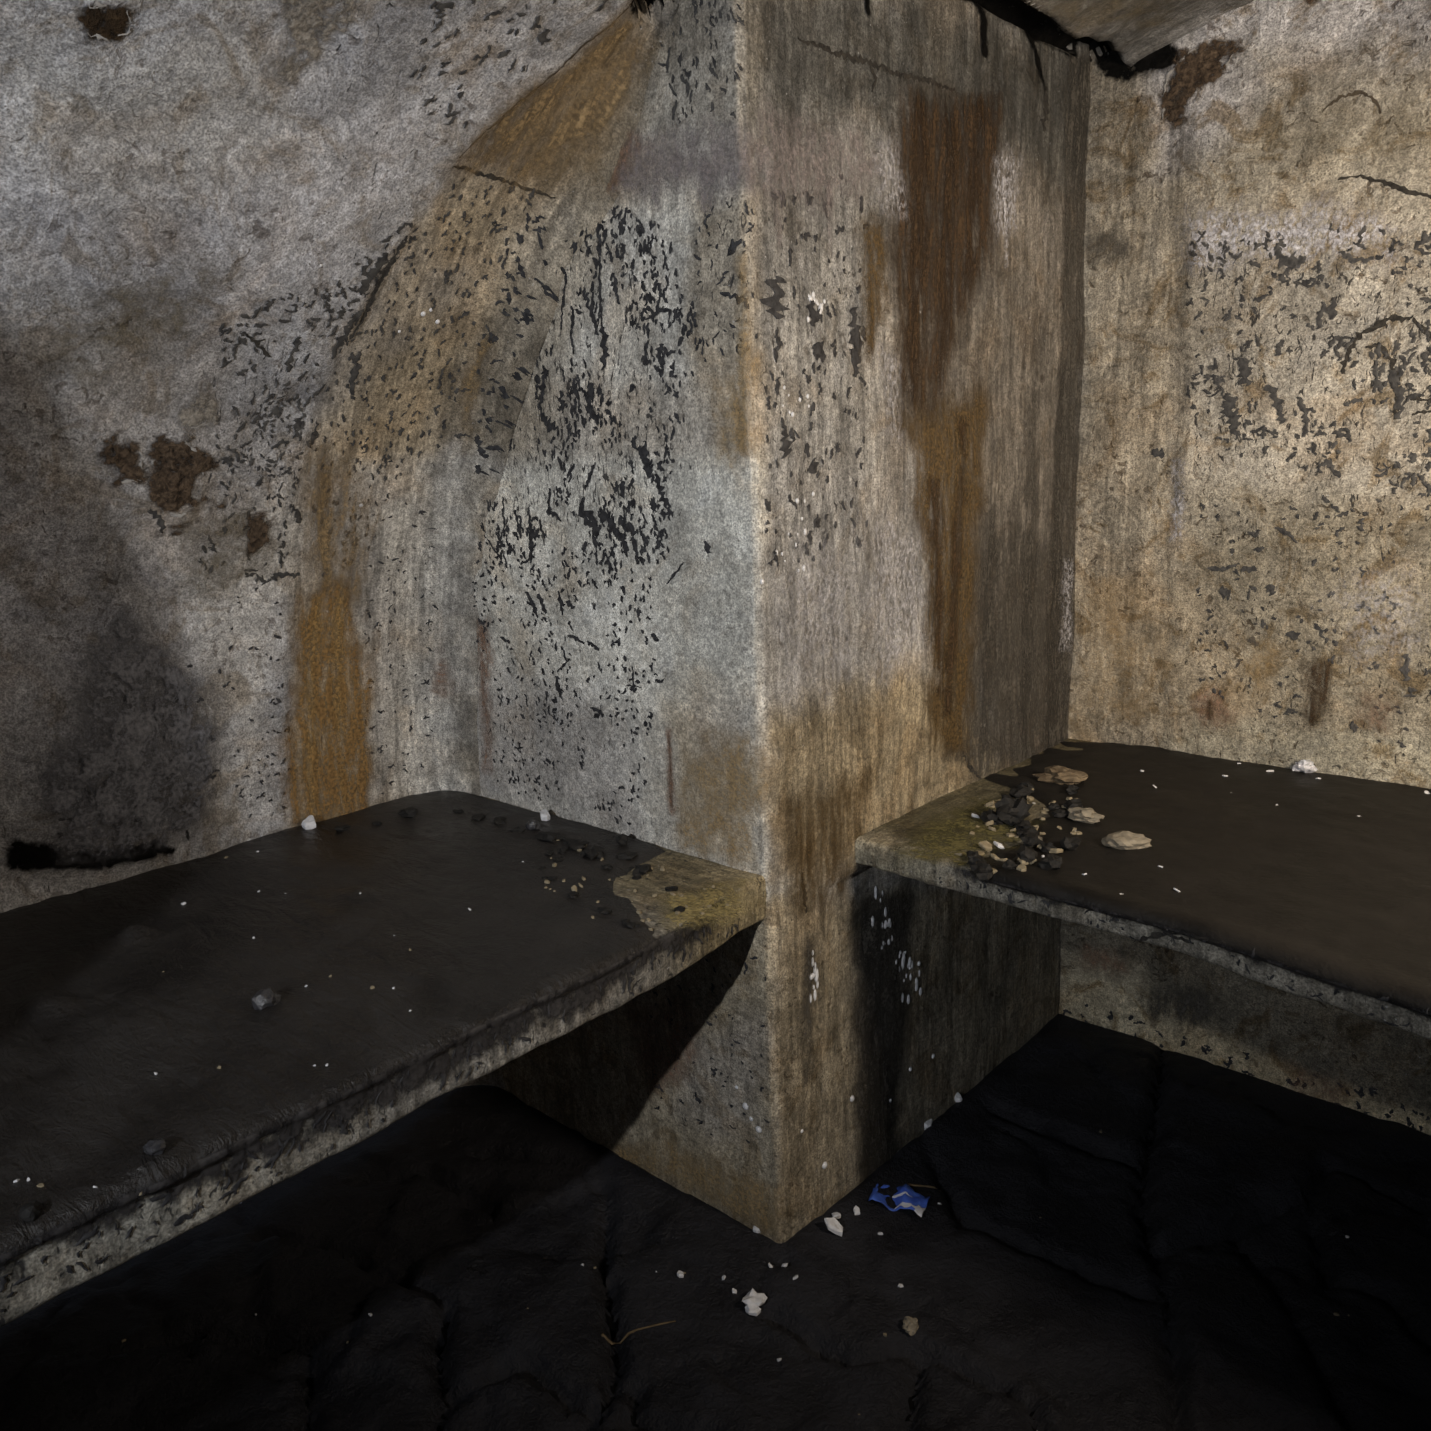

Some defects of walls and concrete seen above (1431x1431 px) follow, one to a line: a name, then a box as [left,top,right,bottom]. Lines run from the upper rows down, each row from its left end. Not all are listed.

spalling [77,1,132,43]
peeling [410,1,551,129]
peeling [631,0,745,124]
crack [798,37,955,157]
efflorescence [1188,211,1382,269]
crack [1338,174,1431,199]
damp [935,55,1128,781]
peeling [98,178,868,825]
corrosion [285,581,372,824]